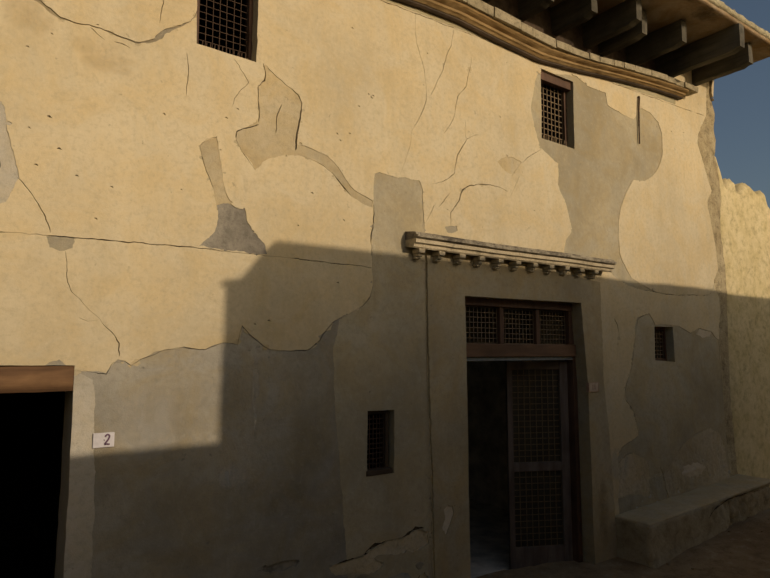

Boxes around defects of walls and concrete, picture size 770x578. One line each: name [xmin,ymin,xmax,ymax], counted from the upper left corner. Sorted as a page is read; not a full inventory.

spalling [0,101,19,203]
crack [34,0,197,47]
spalling [80,68,433,578]
spalling [618,82,738,509]